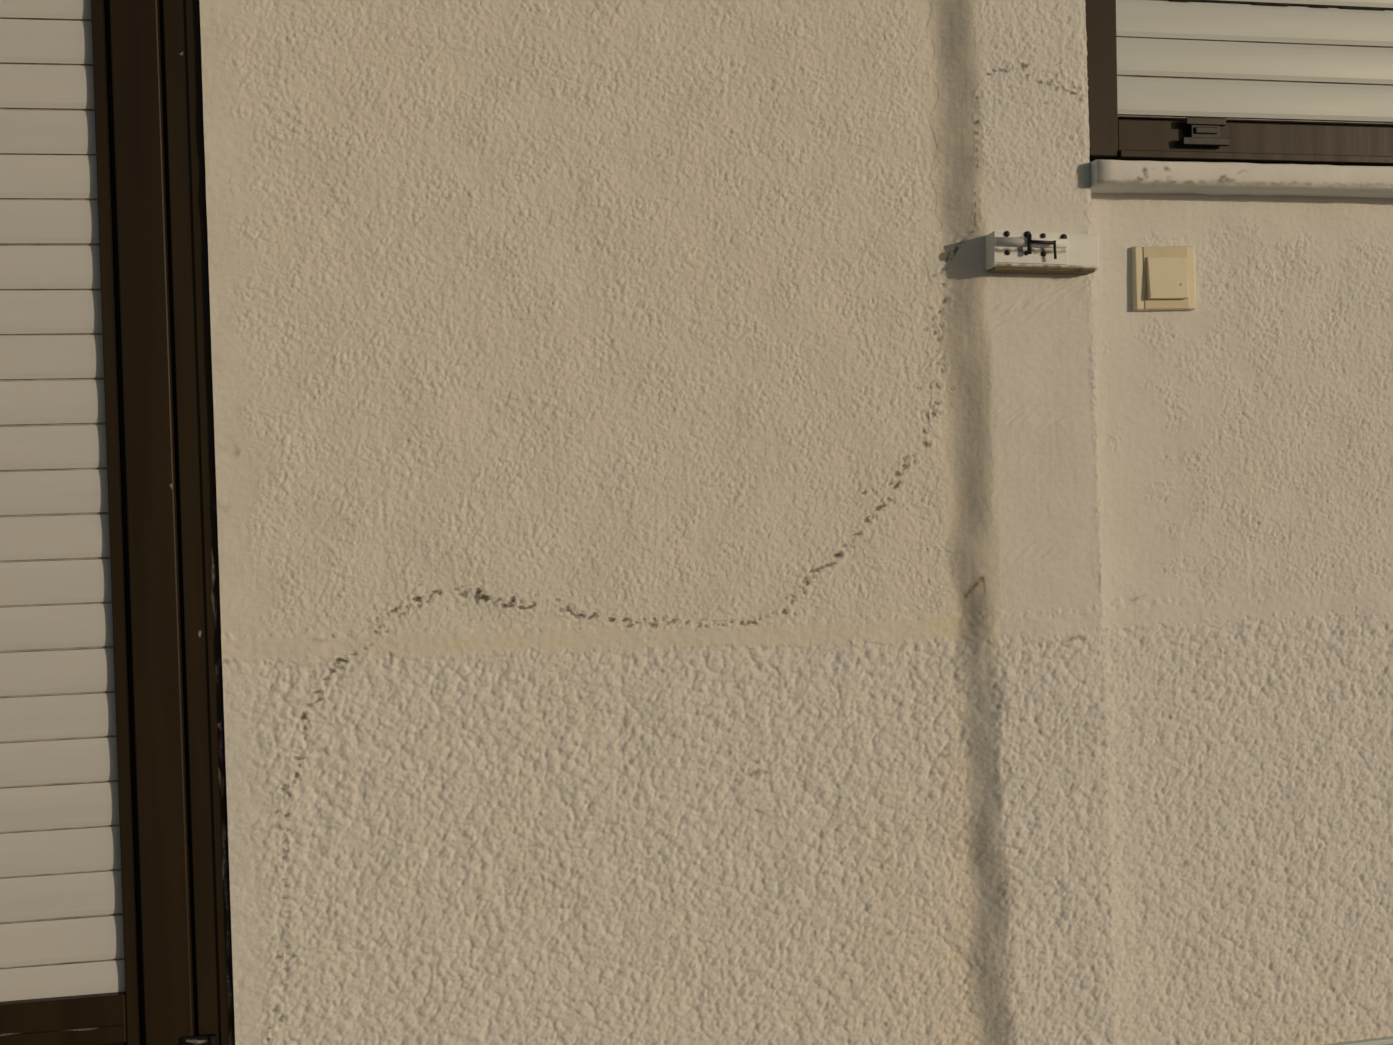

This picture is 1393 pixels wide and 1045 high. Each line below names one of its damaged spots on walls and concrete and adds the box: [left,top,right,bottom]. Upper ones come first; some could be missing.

crack [475,589,533,609]